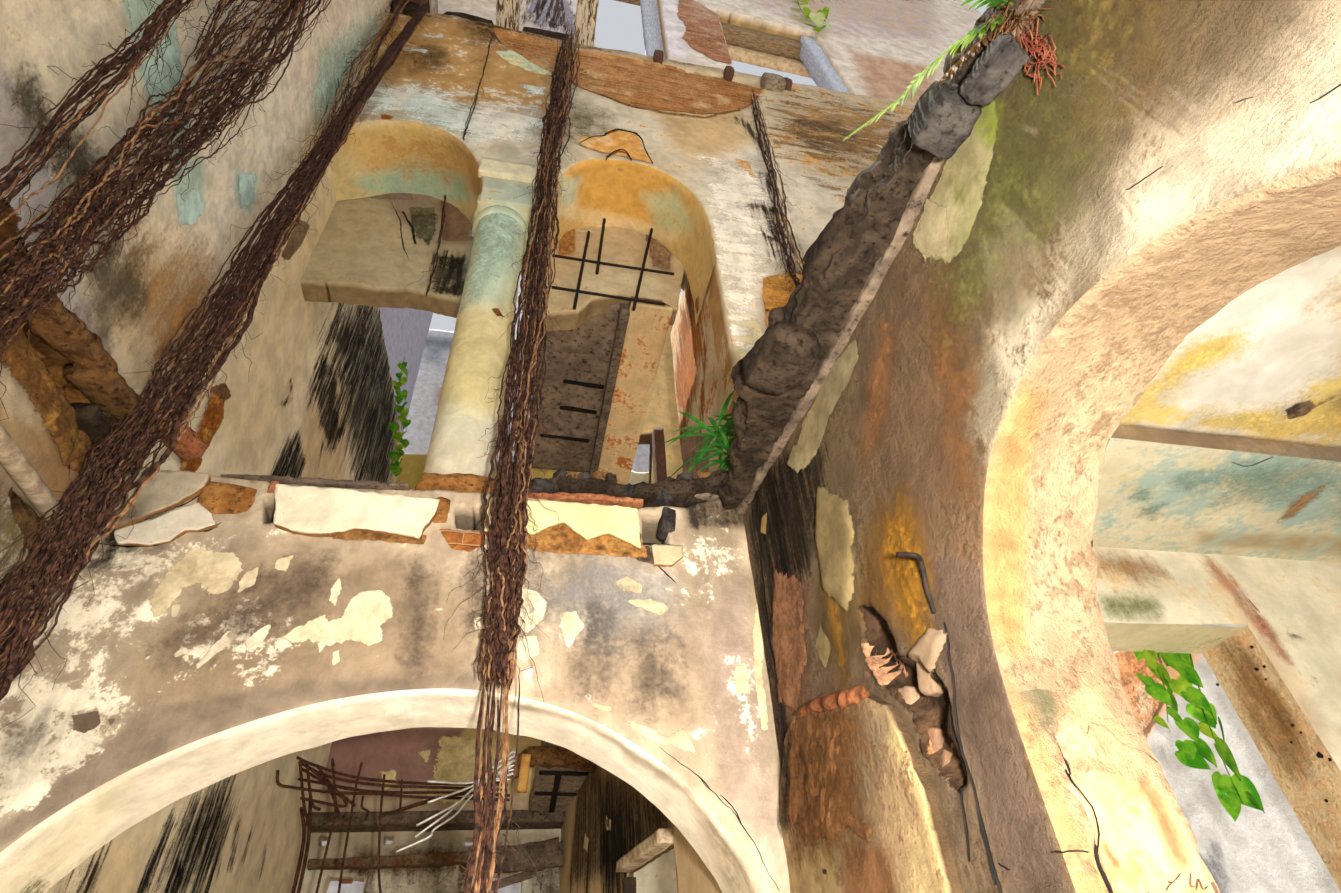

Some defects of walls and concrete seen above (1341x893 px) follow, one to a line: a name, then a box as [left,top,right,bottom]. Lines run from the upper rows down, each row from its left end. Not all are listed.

flaking render [359,0,764,144]
flaking render [579,129,652,163]
mould [272,303,399,483]
flaking render [333,497,489,552]
flaking render [517,489,676,564]
peeling [174,579,393,669]
peeling [517,588,547,683]
spalling [733,570,967,790]
water stain [54,840,112,893]
water stain [137,773,268,893]
crack [944,622,1010,893]
crack [1050,722,1159,893]